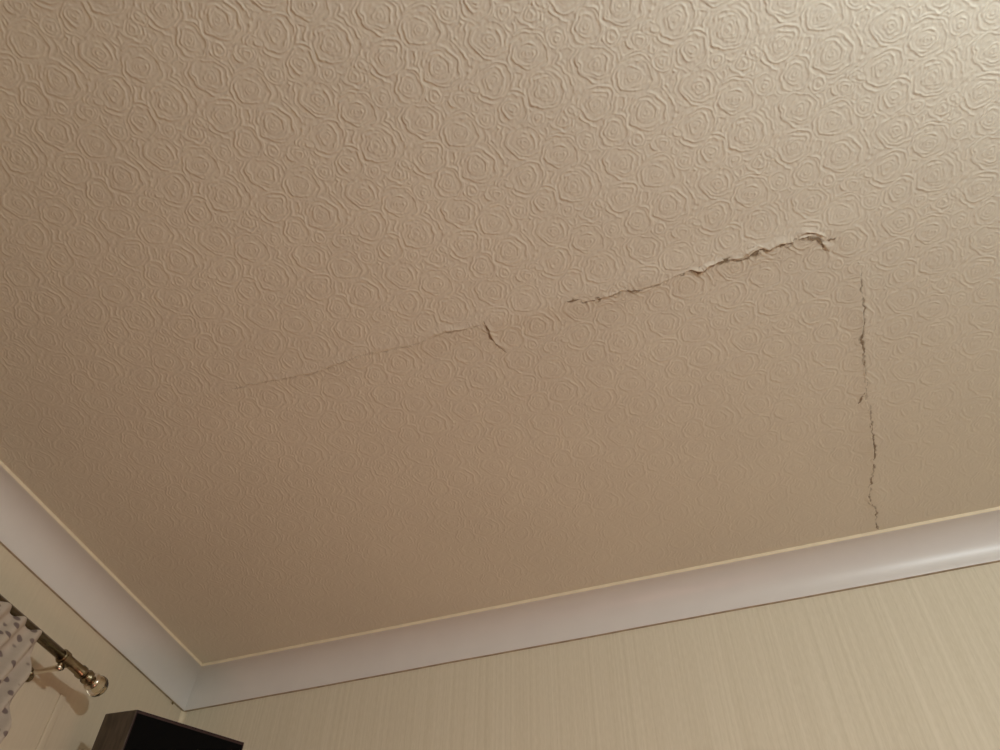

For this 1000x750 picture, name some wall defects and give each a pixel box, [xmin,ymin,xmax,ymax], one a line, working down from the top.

crack [563,228,837,302]
crack [854,259,878,531]